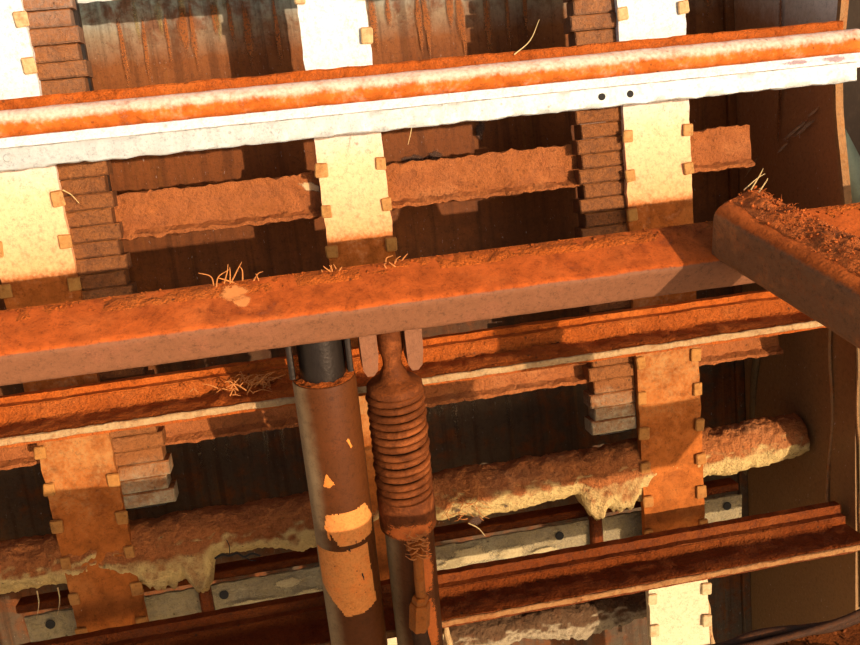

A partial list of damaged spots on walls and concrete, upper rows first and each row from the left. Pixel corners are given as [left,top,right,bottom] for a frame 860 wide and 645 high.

peeling [222,285,250,307]